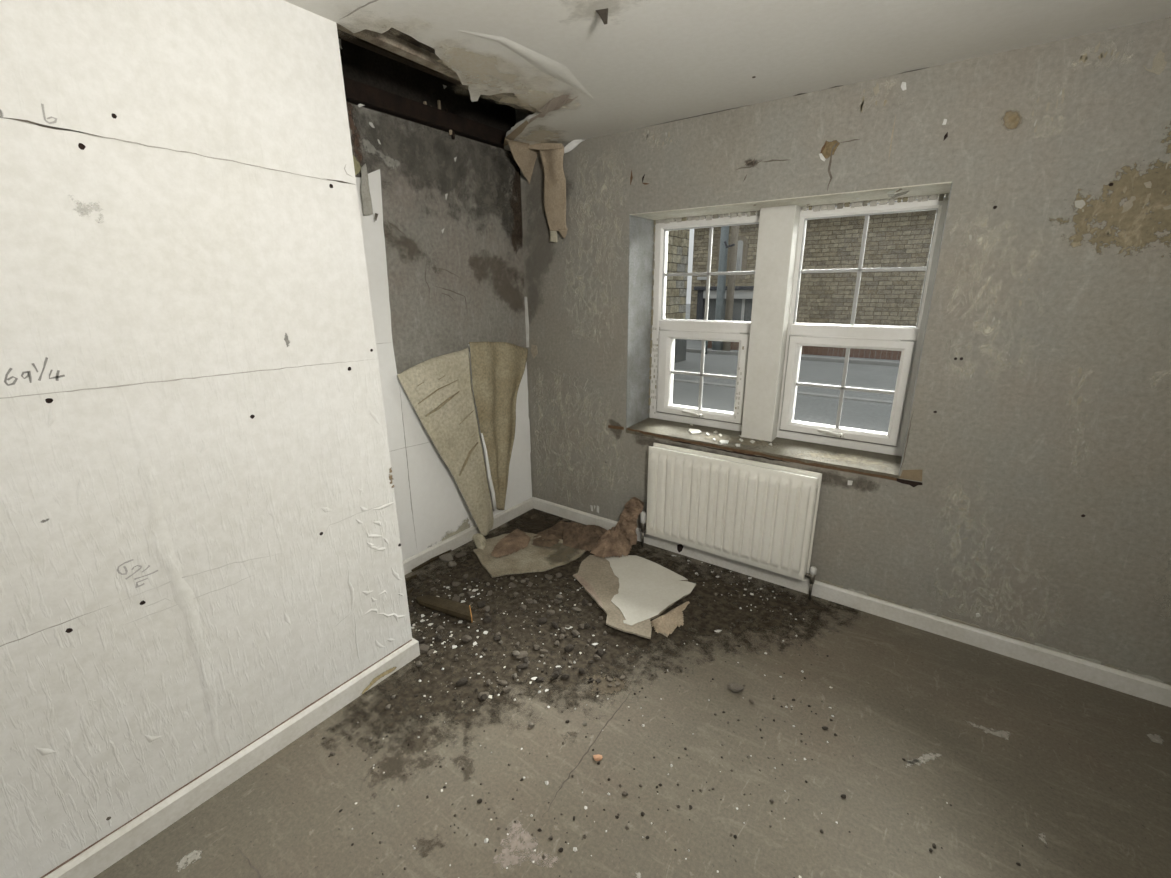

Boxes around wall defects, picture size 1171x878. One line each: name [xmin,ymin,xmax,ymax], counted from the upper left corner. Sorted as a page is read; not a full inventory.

damp [383,225,425,260]
damp [348,104,523,252]
damp [469,257,524,311]
peeling [1050,123,1171,257]